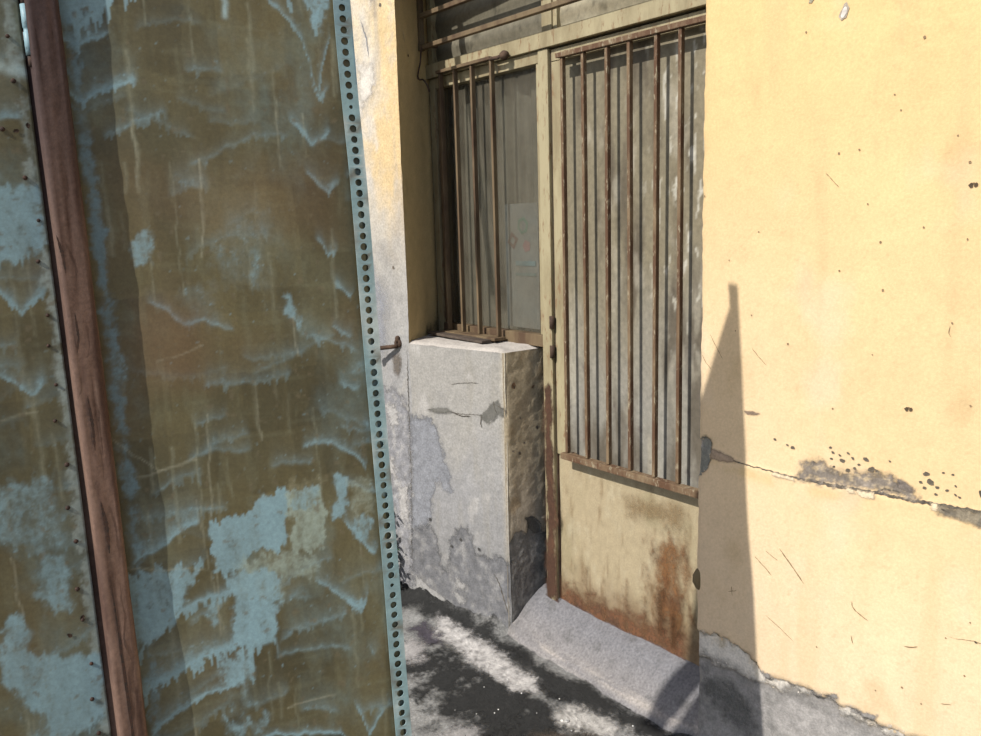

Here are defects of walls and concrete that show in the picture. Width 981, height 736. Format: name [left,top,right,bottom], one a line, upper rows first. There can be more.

flaking render [383,385,547,628]
corrosion [542,384,695,660]
crack [734,460,981,513]
peeling [797,446,981,528]
water stain [404,638,426,664]
water stain [439,724,479,736]
water stain [433,616,538,693]
water stain [554,704,629,736]
flaking render [698,631,905,736]